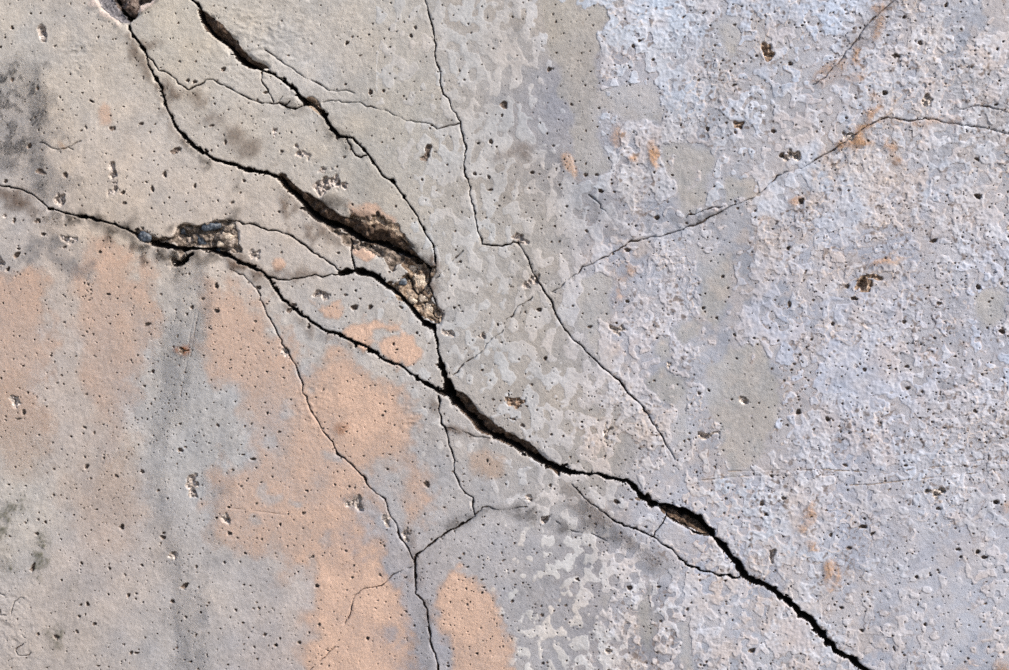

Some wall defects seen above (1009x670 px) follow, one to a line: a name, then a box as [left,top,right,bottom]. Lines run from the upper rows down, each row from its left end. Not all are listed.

spalling [89,0,154,24]
crack [814,117,943,161]
hole [313,167,348,197]
crack [0,185,139,238]
spalling [134,219,261,265]
spalling [313,289,331,300]
crack [128,0,870,670]
peeling [325,0,1009,670]